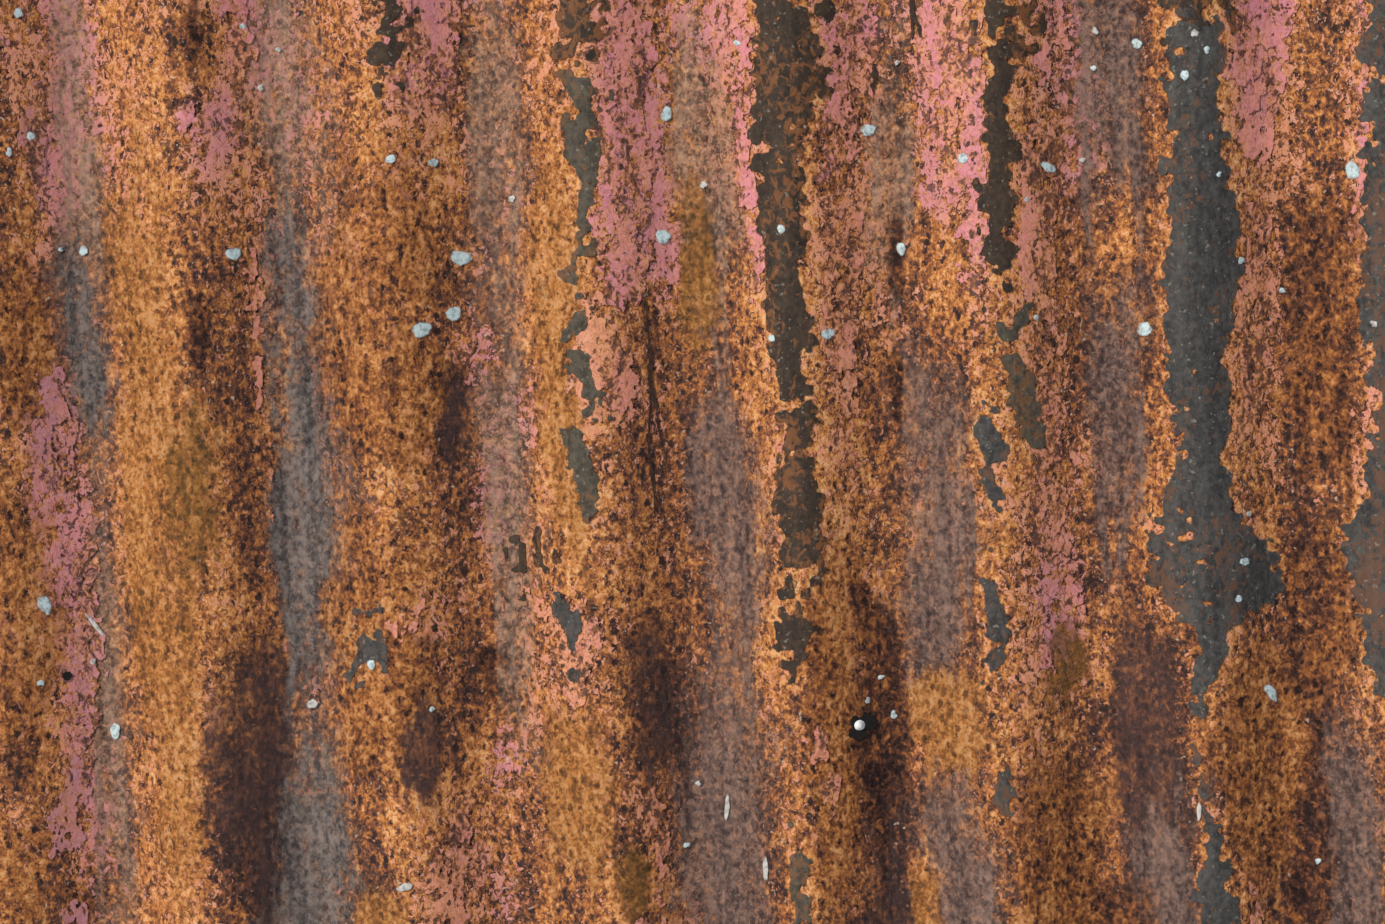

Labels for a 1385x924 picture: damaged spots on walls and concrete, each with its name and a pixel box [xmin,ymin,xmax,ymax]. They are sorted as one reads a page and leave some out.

corrosion [0,465,72,768]
corrosion [107,138,294,924]
corrosion [317,506,443,808]
corrosion [310,146,467,479]
peeling [366,0,462,115]
peeling [549,0,661,524]
peeling [722,0,888,685]
corrosion [804,542,985,911]
peeling [911,0,1074,563]
peeling [1144,0,1301,719]
corrosion [1204,193,1364,924]
peeling [1337,0,1385,698]